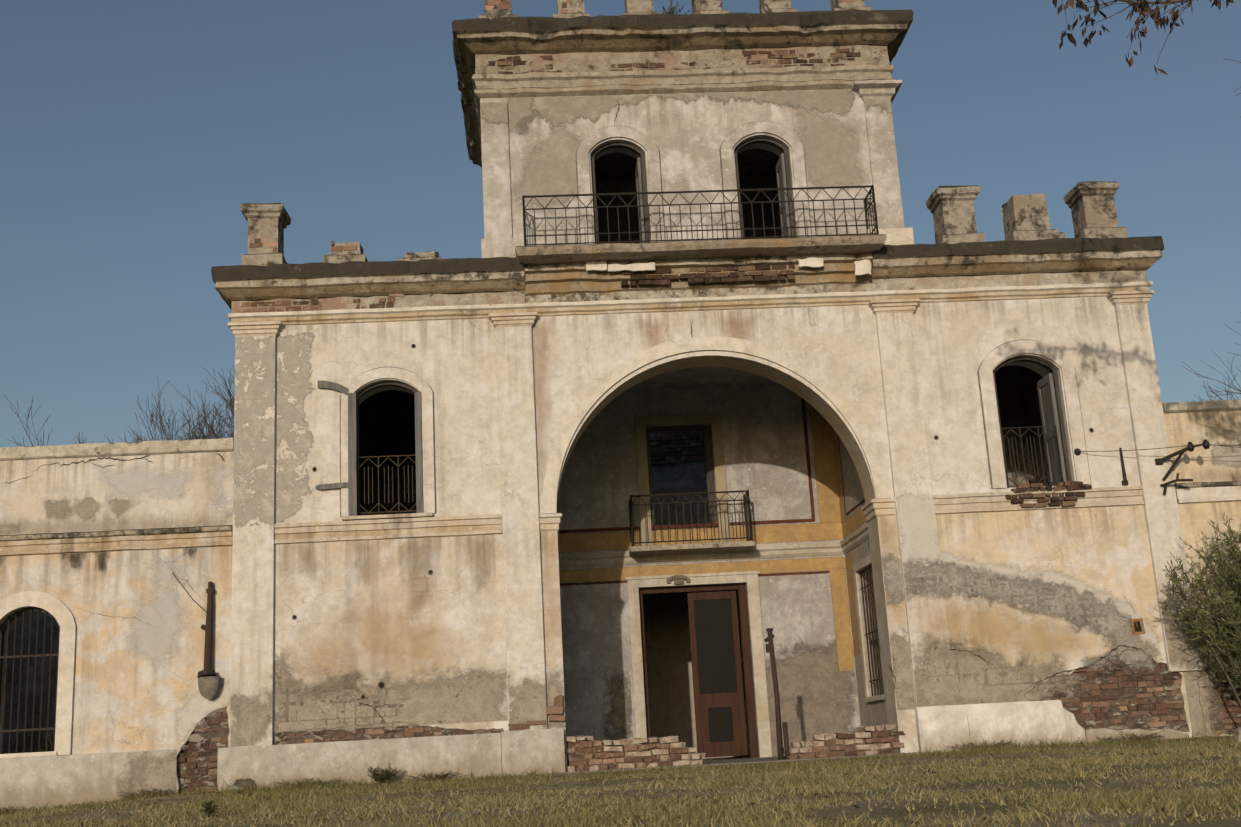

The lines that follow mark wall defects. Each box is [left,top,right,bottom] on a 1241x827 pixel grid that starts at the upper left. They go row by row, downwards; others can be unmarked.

flaking render [486,55,561,75]
flaking render [606,62,711,71]
flaking render [742,48,876,68]
flaking render [585,257,823,287]
peeling [233,333,317,527]
crack [2,455,151,484]
peeling [1212,443,1241,468]
flaking render [1006,481,1092,508]
flaking render [882,494,1241,738]
spalling [604,670,632,746]
spalling [766,640,855,757]
spalling [122,657,565,798]